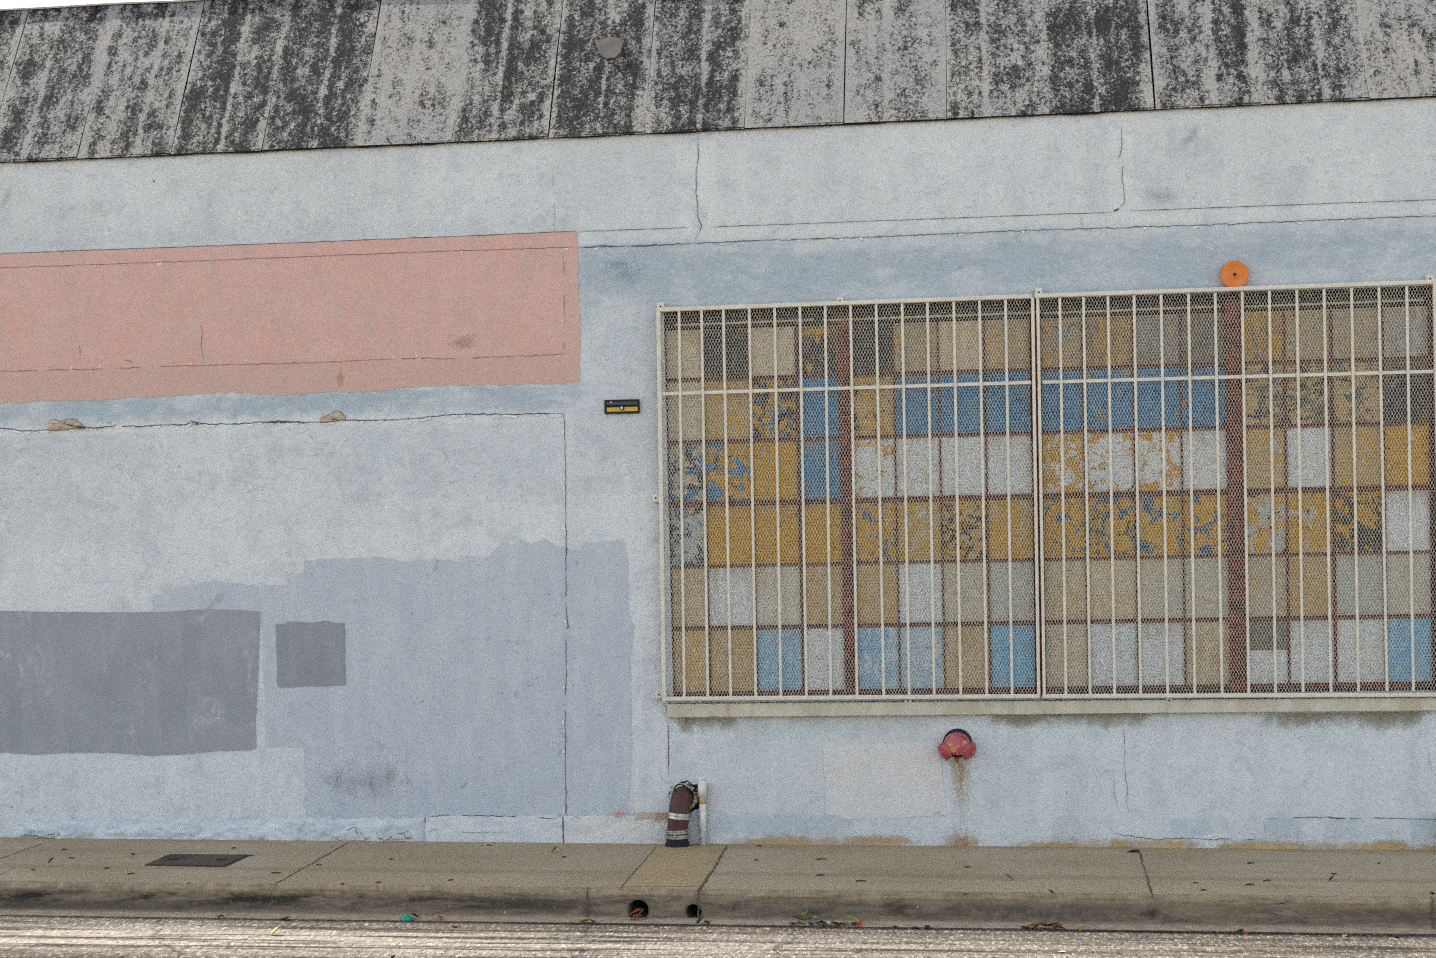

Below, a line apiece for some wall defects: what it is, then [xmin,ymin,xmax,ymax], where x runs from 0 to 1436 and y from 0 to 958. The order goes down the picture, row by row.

crack [0,126,1436,371]
spalling [320,411,346,423]
spalling [45,419,85,431]